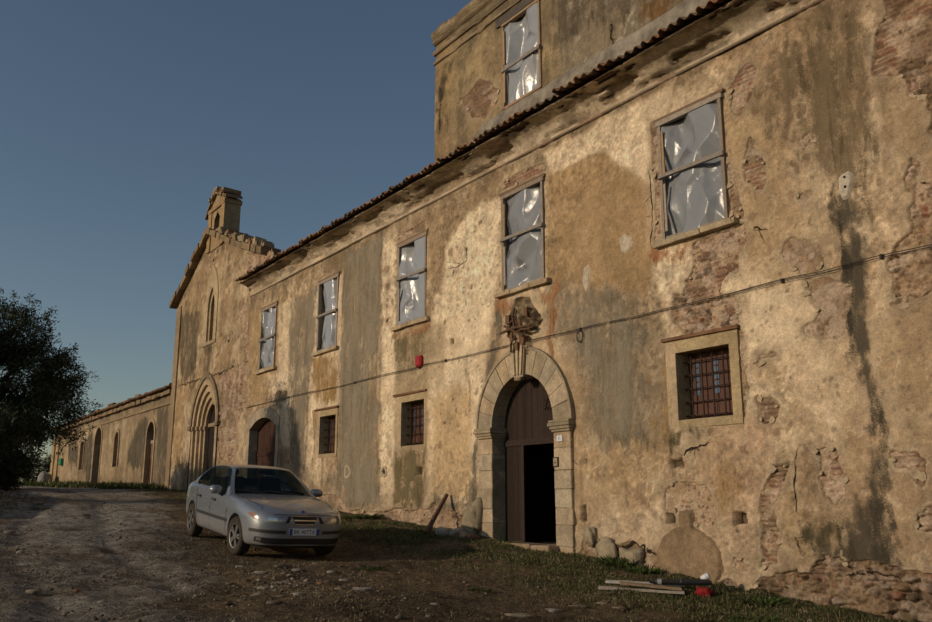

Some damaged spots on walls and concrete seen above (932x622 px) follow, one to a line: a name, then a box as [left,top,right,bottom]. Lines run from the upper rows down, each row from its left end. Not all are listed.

spalling [460,79,500,119]
spalling [872,0,932,111]
spalling [673,137,780,424]
damp [755,0,888,435]
spalling [886,158,932,310]
spalling [812,445,849,505]
spalling [751,463,932,622]
damp [819,444,903,566]
spalling [889,451,927,487]